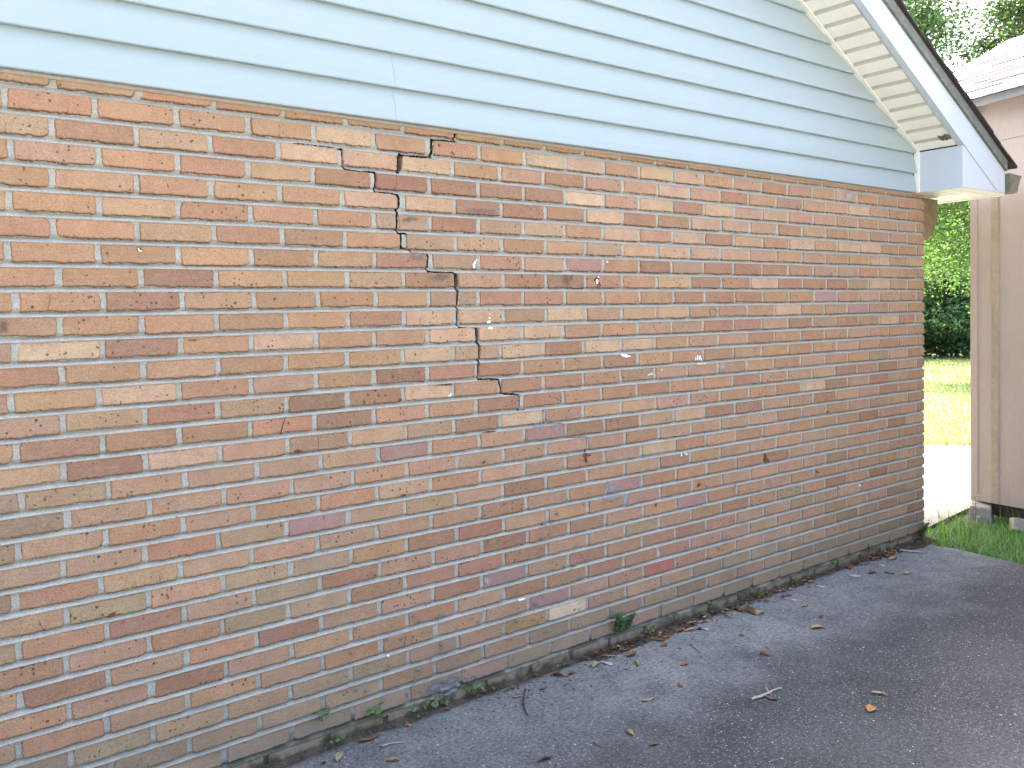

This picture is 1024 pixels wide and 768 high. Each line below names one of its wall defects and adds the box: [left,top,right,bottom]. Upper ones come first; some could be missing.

crack [293,134,587,452]